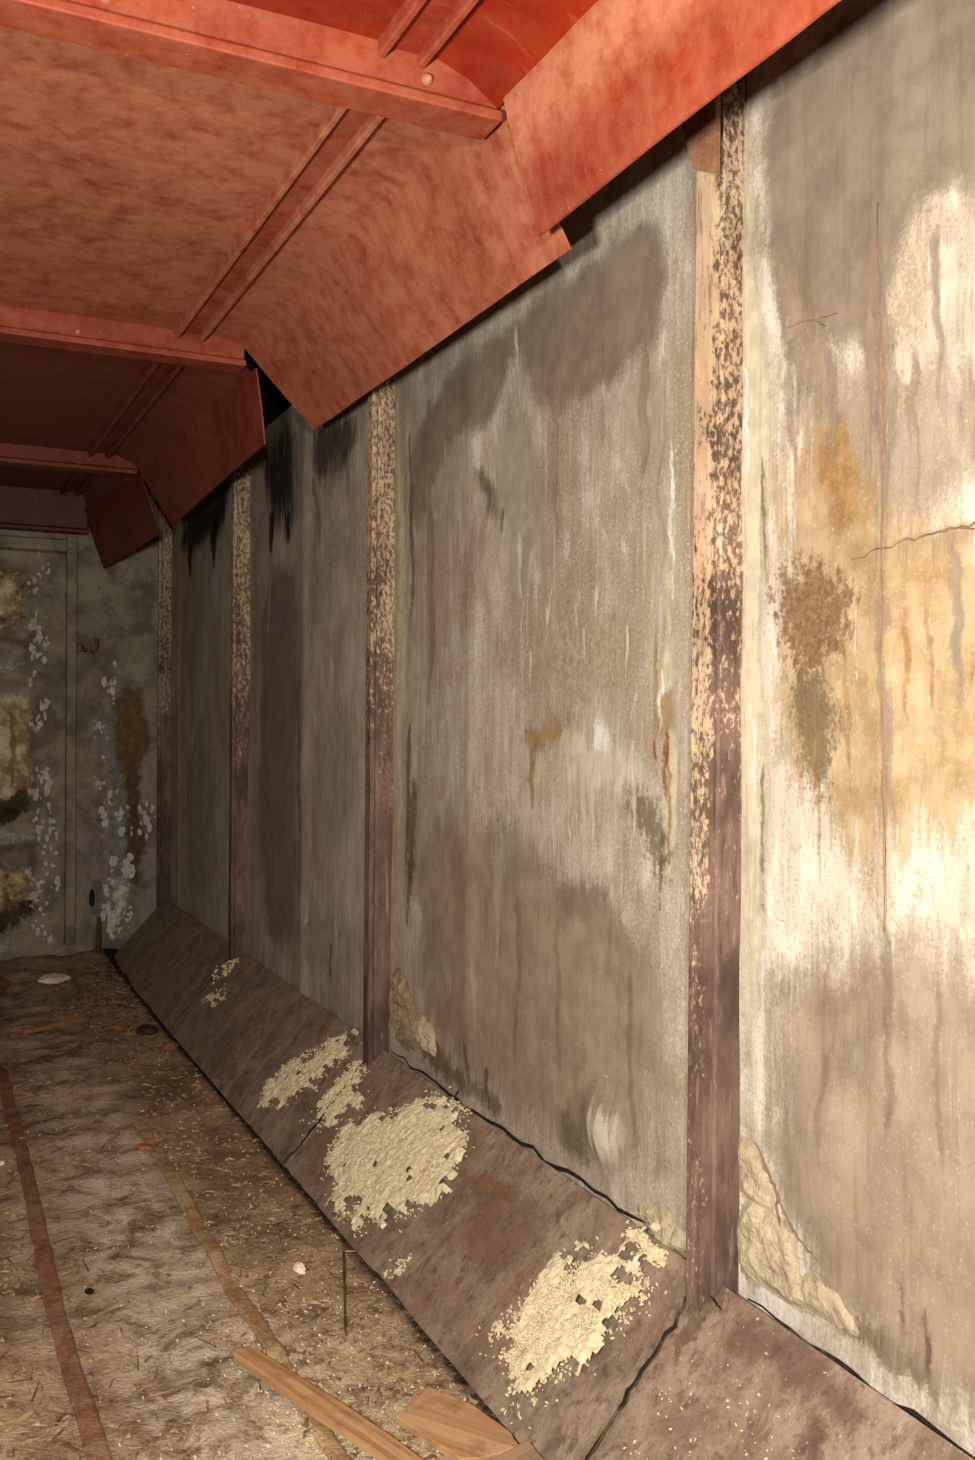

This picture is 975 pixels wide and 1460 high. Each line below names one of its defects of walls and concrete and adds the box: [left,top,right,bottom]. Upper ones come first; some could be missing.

leakage [94,664,137,935]
corrosion [116,689,149,883]
leakage [395,226,682,1160]
leakage [740,0,975,1418]
corrosion [766,405,975,863]
crack [851,201,975,931]